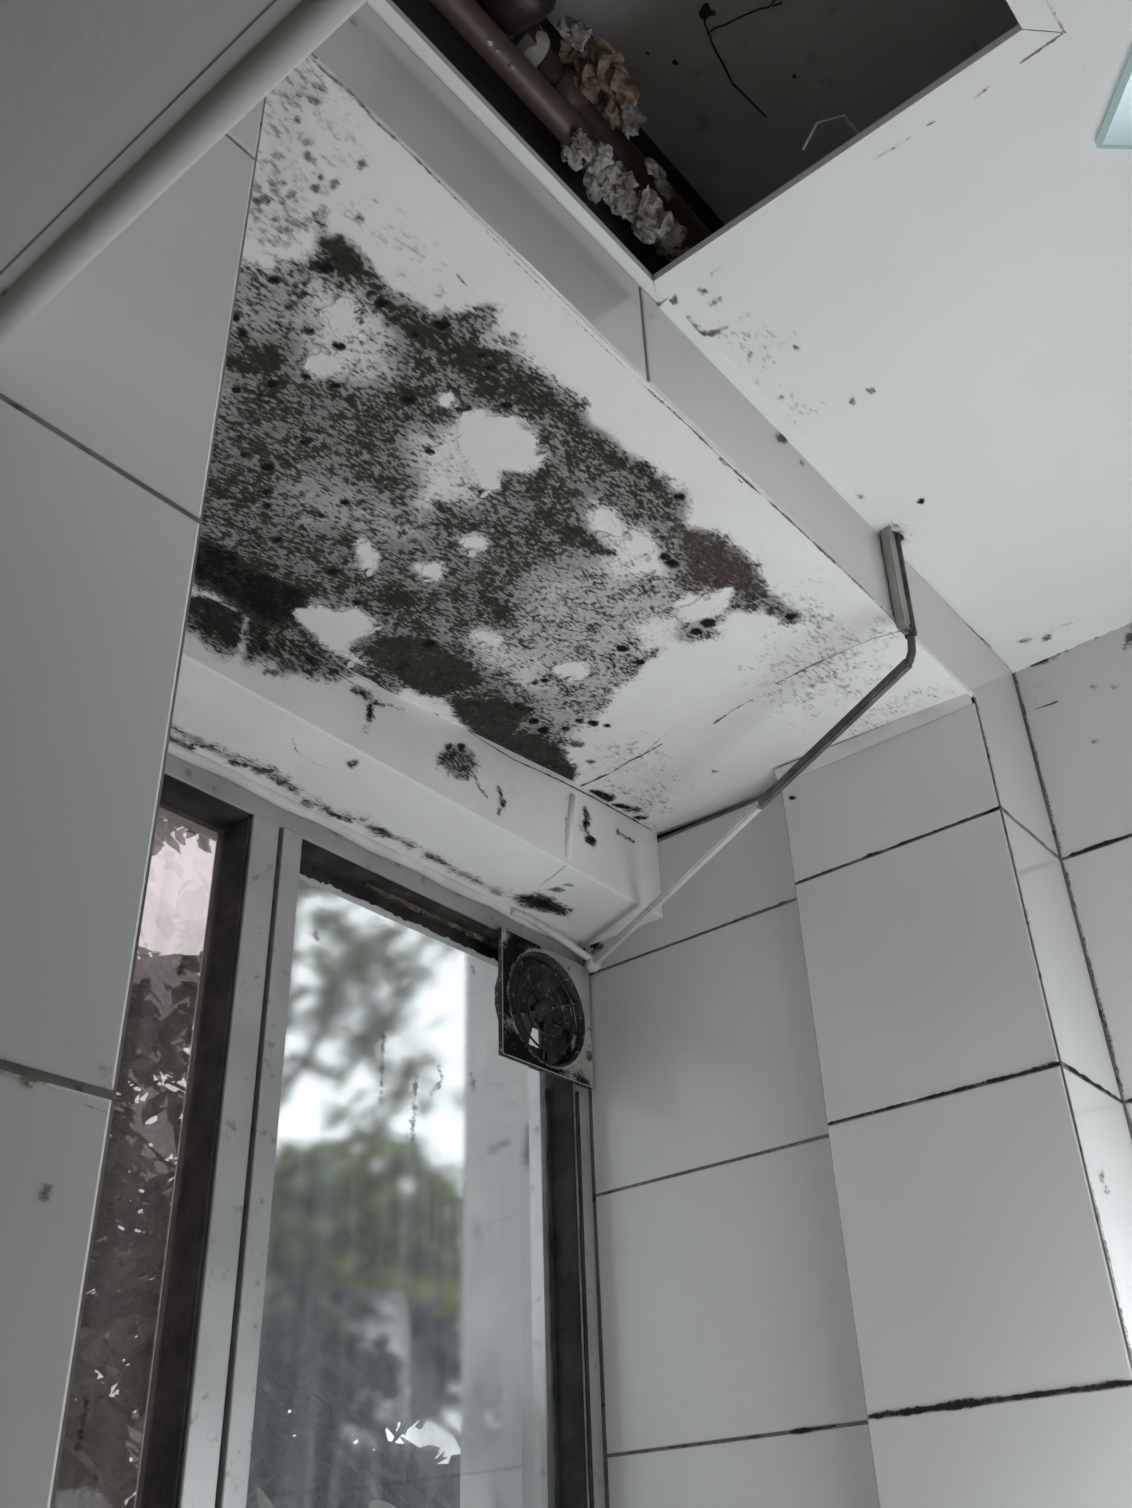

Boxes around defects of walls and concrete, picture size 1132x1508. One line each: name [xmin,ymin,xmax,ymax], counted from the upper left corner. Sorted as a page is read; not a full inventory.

damp [187,69,806,816]
damp [170,726,573,916]
damp [581,785,663,845]